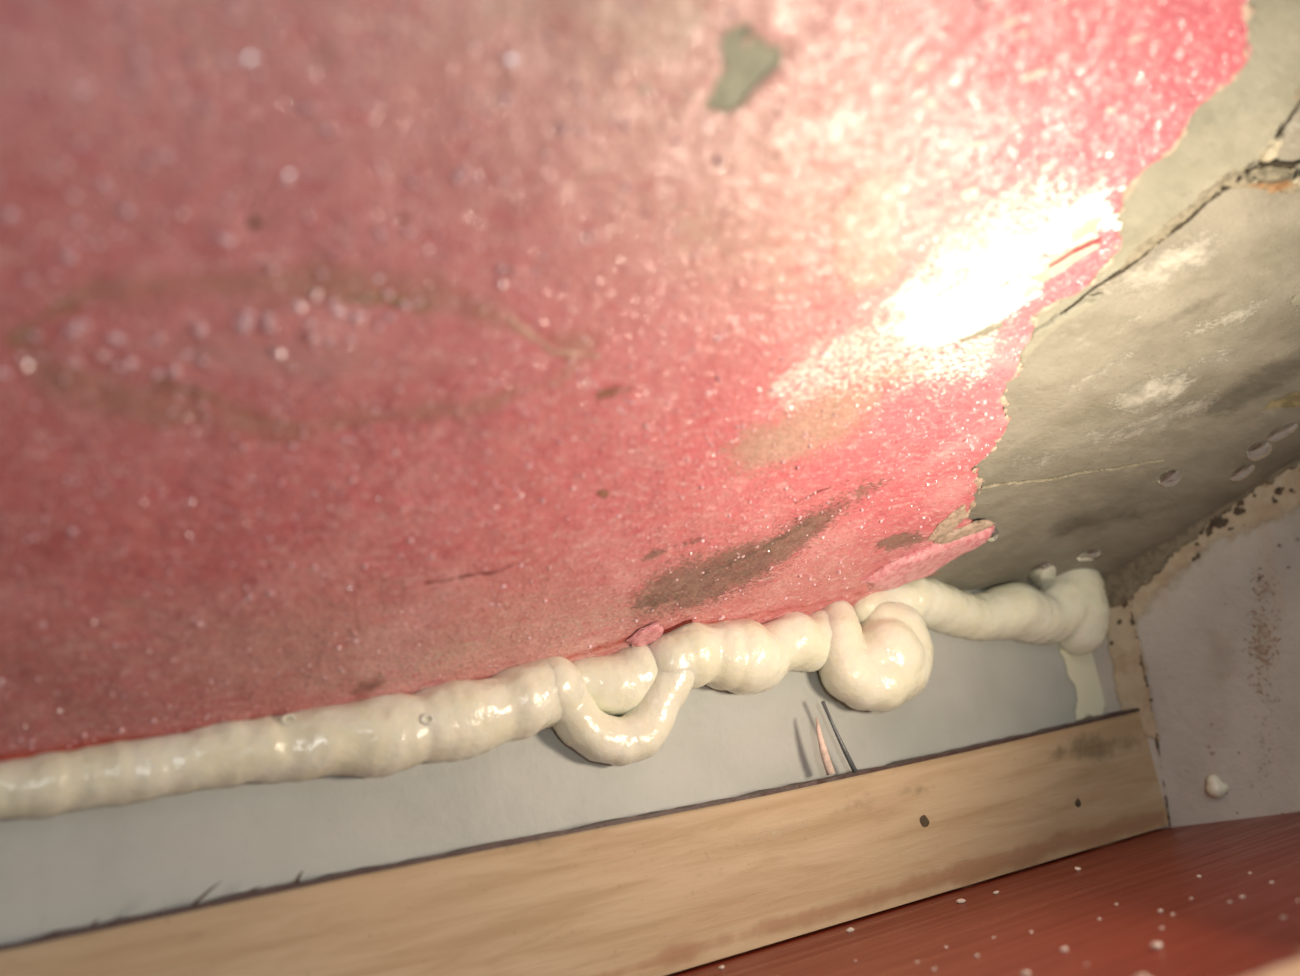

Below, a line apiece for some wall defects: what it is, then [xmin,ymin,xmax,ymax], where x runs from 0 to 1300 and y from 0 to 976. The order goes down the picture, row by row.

peeling [704,23,786,116]
peeling [754,0,1300,418]
crack [1060,102,1300,314]
spalling [1083,296,1273,447]
damp [629,477,889,626]
spalling [981,451,1164,489]
damp [1192,485,1295,561]